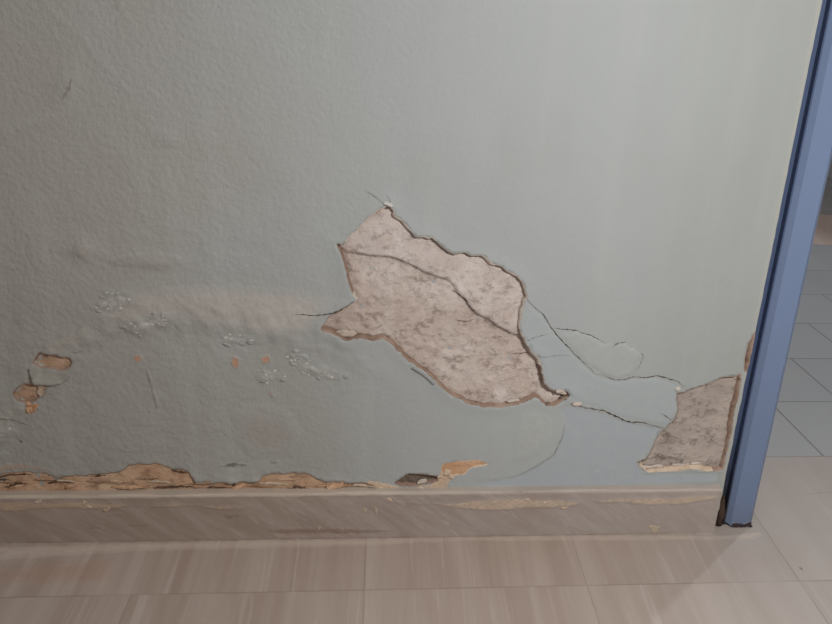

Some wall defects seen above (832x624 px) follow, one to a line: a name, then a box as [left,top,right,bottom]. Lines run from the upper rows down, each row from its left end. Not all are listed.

damp [97,284,338,341]
flaking render [320,201,755,486]
crack [527,299,684,391]
peeling [12,352,73,414]
crack [570,402,672,428]
peeling [0,460,490,501]